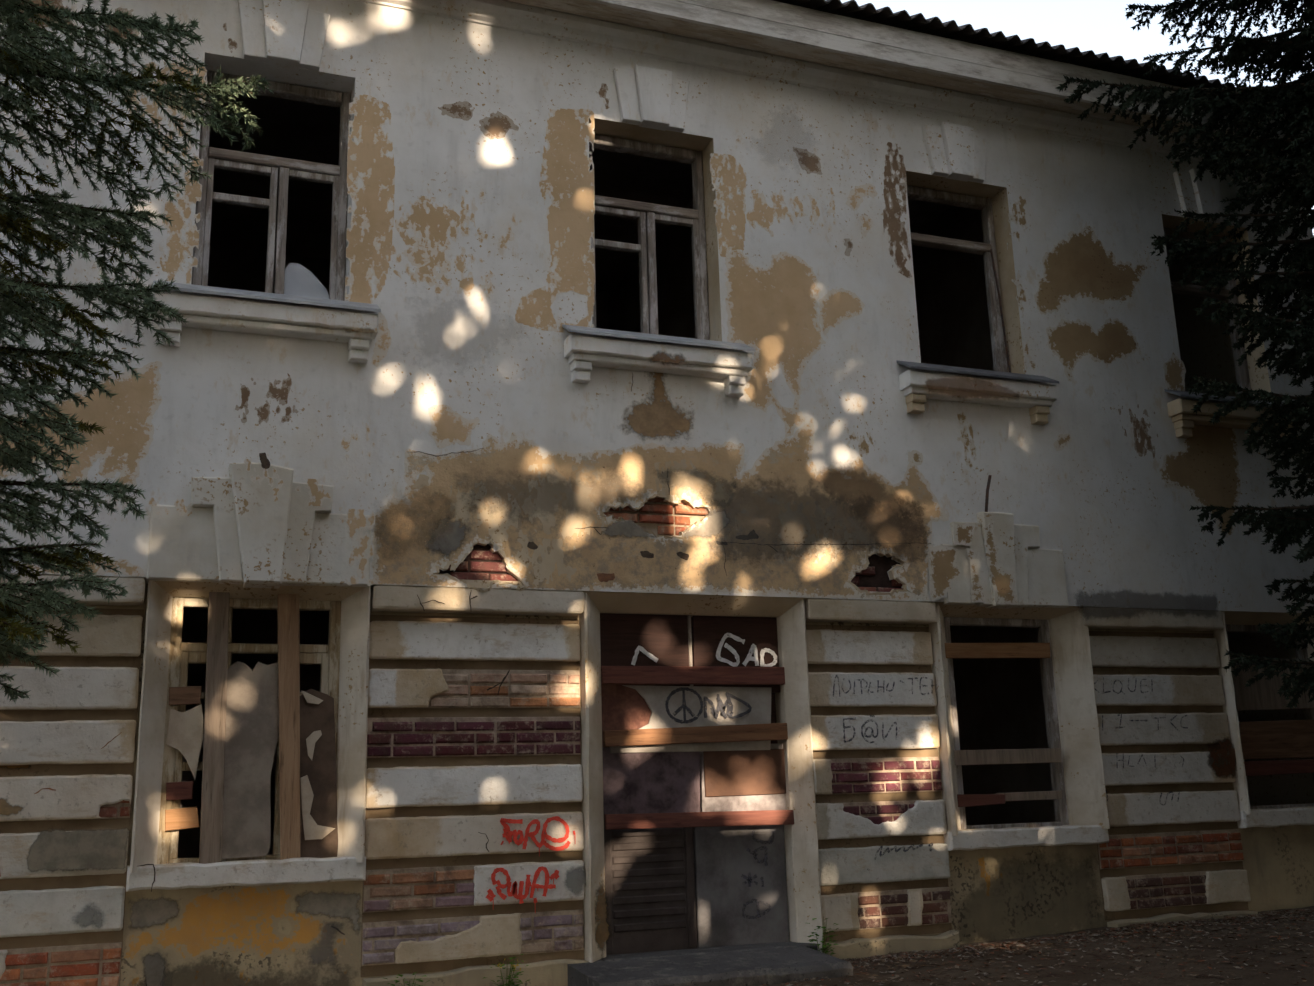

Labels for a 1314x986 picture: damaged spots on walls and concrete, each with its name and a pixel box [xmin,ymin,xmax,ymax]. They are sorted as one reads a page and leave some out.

peeling [345,94,522,367]
peeling [515,83,610,334]
peeling [1007,195,1031,254]
peeling [1011,226,1148,382]
peeling [0,361,162,491]
spalling [259,452,270,469]
peeling [295,142,1015,605]
peeling [0,885,329,986]
flaking render [362,865,489,966]